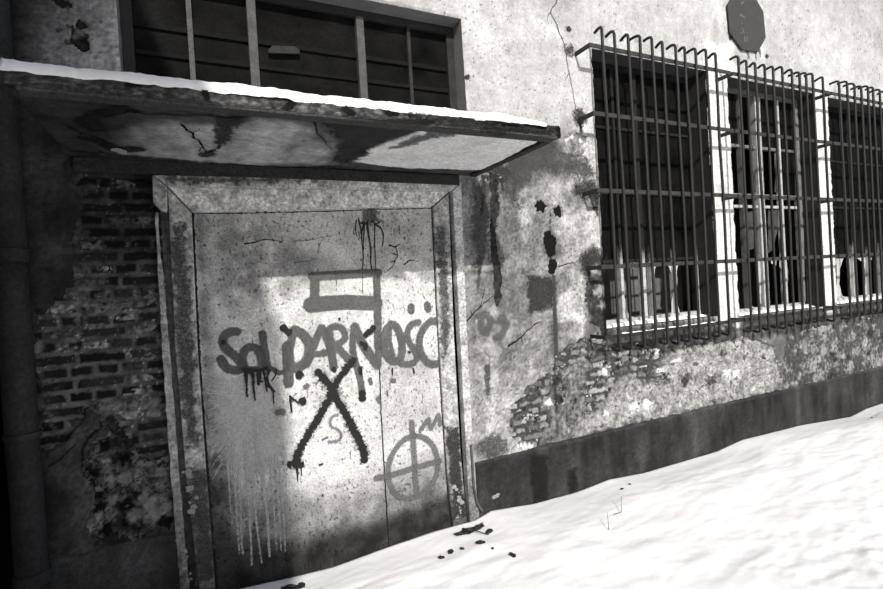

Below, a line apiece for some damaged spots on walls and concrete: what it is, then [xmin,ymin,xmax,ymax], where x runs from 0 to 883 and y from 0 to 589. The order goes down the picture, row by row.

peeling [52,0,72,9]
peeling [56,19,90,52]
crack [547,0,578,119]
crack [67,90,249,155]
water stain [280,116,598,289]
flaking render [34,173,192,583]
flaking render [508,258,883,450]
peeling [181,431,199,514]